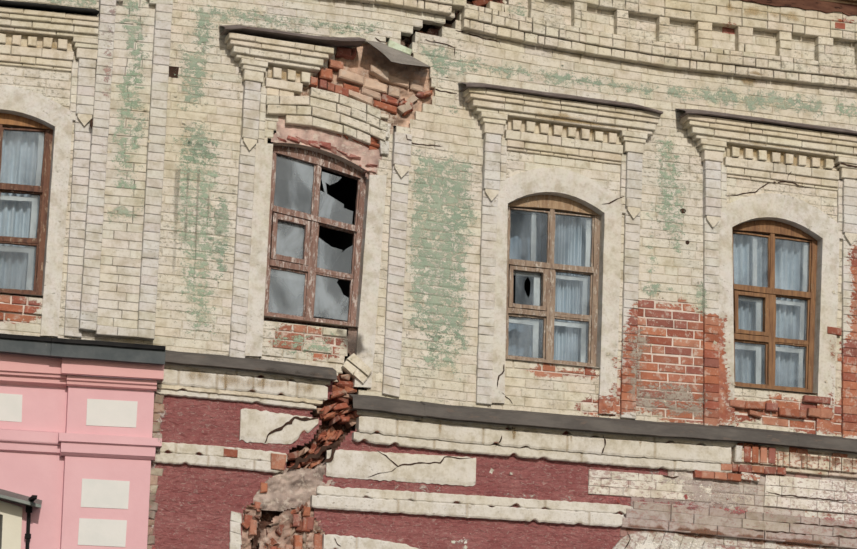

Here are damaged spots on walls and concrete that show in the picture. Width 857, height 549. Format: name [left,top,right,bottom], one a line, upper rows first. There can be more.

spalling [169,5,823,334]
crack [727,172,809,196]
spalling [0,295,43,324]
spalling [262,321,348,364]
crack [265,319,364,472]
peeling [406,149,480,382]
spalling [514,360,584,374]
spalling [568,135,730,420]
spalling [729,326,842,432]
crack [370,451,466,477]
spalling [649,443,786,516]
crack [250,510,281,549]